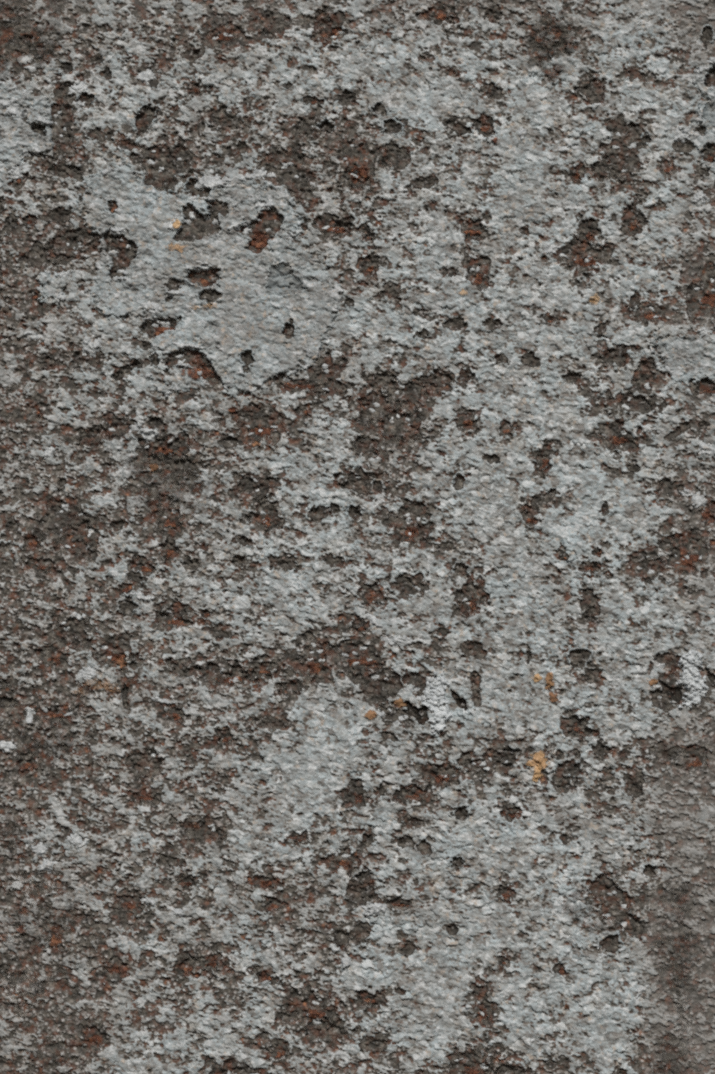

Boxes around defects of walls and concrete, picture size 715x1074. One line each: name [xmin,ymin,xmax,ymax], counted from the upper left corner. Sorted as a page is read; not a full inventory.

rust [87,127,195,191]
rust [256,114,411,202]
rust [168,200,229,253]
rust [236,208,284,254]
rust [442,254,498,294]
rust [162,349,222,384]
rust [594,344,656,455]
rust [76,411,207,577]
rust [382,498,434,558]
rust [357,572,429,607]
rust [335,712,598,808]
rust [201,1038,293,1074]